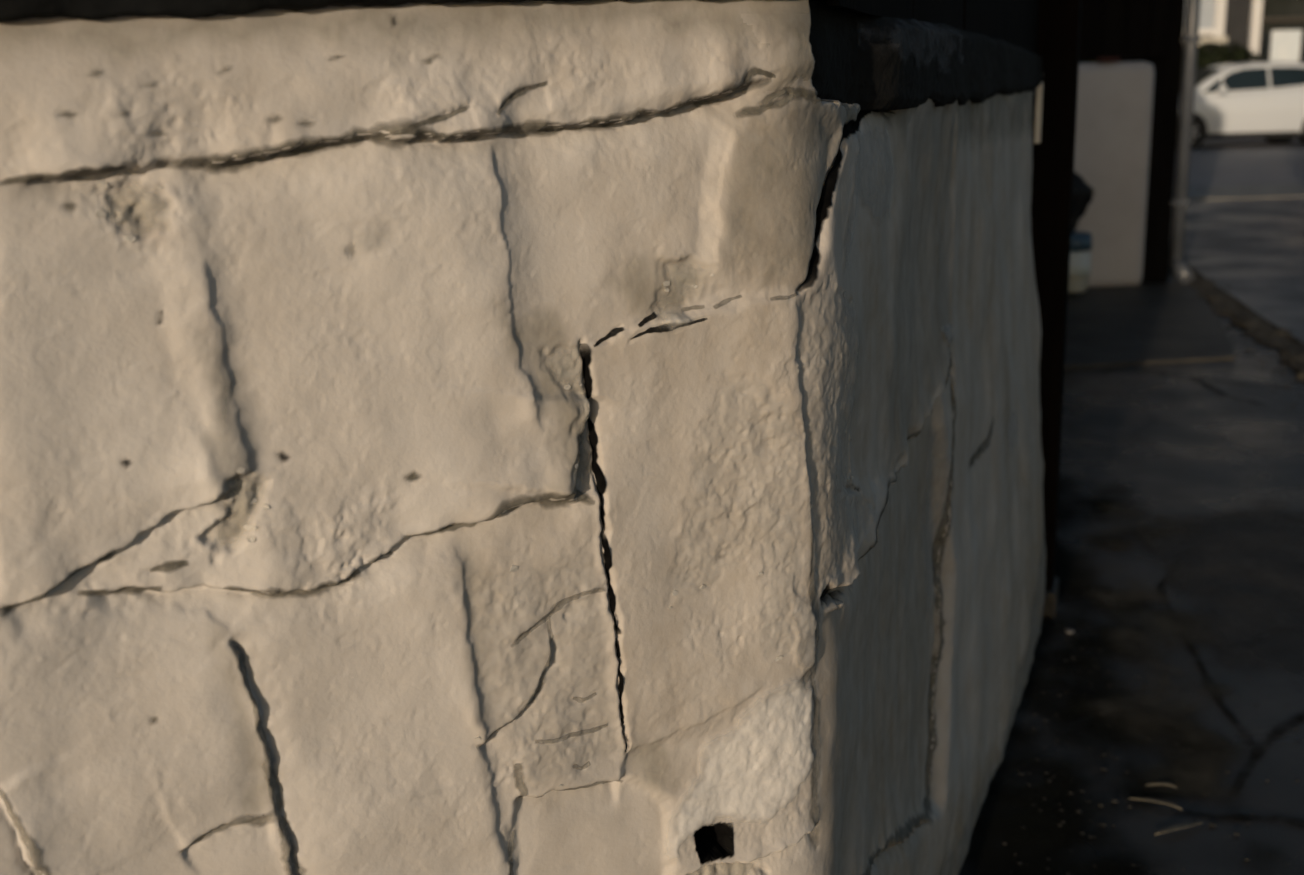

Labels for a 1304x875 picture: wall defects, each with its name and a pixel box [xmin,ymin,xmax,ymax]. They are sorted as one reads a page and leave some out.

crack [175,68,821,171]
crack [2,167,123,184]
crack [225,110,897,843]
crack [2,552,188,615]
crack [1156,578,1304,827]
crack [182,644,304,875]
crack [507,832,515,875]